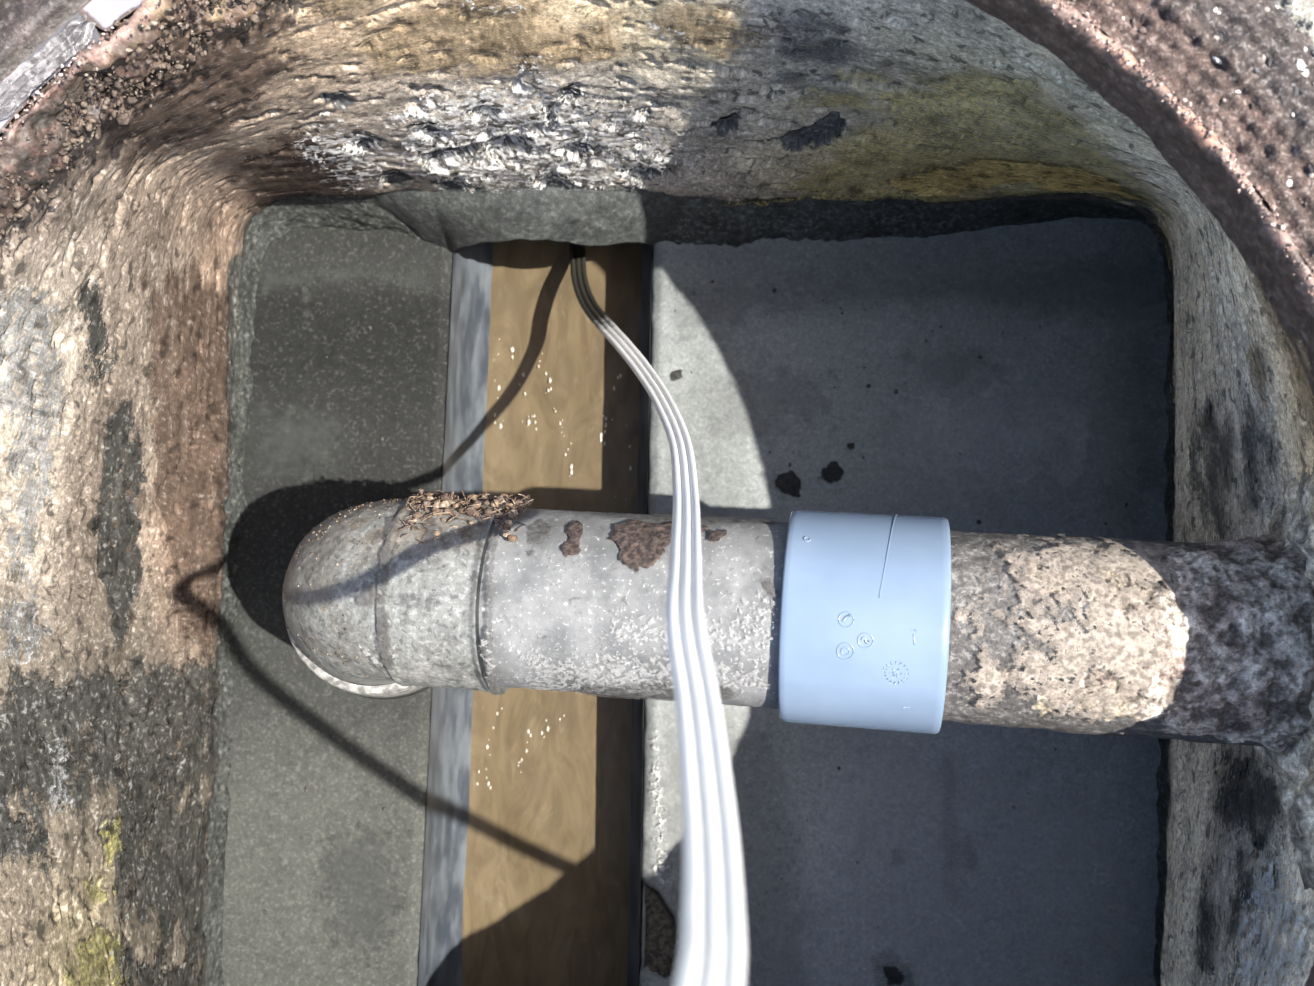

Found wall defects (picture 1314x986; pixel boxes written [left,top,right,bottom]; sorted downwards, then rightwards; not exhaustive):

leakage [287,50,706,198]
leakage [728,9,1170,269]
leakage [222,222,252,561]
leakage [1188,342,1276,541]
leakage [1249,271,1314,438]
leakage [0,278,222,986]
leakage [1194,744,1313,986]